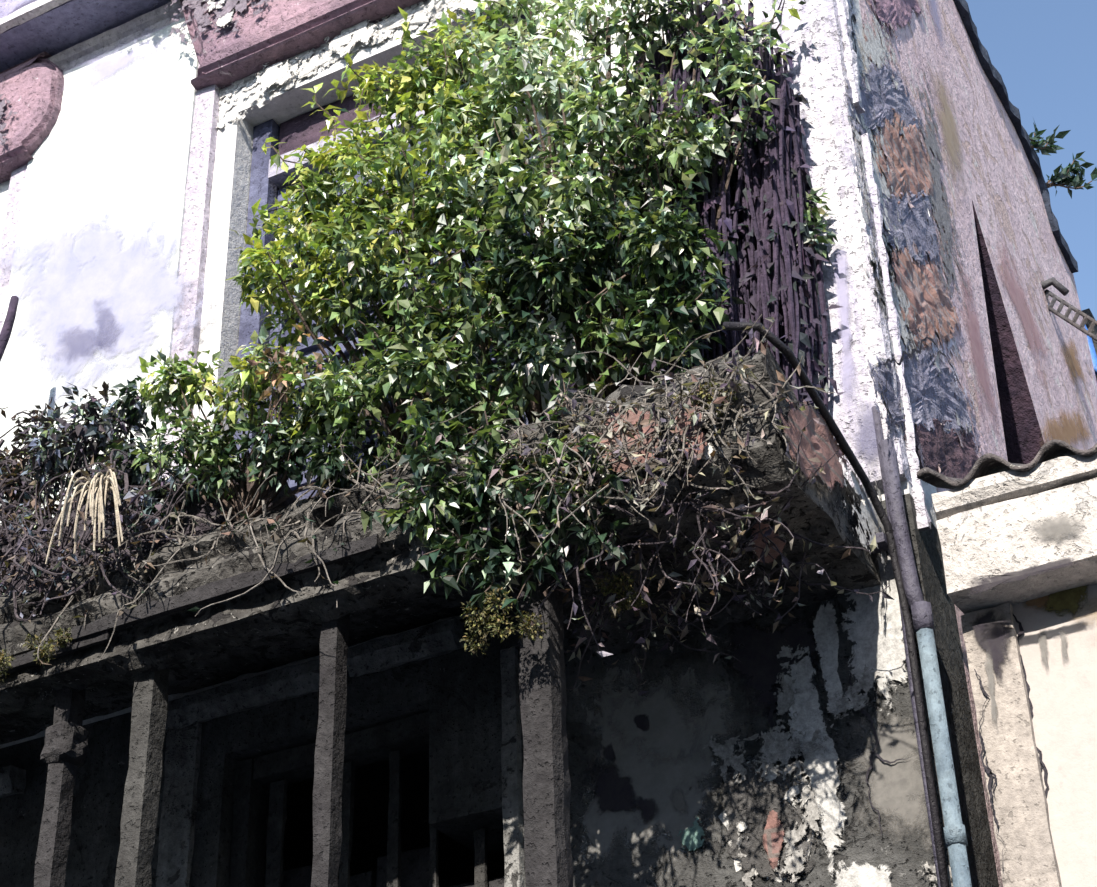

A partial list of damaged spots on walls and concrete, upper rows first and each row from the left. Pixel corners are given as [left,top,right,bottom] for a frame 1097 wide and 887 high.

peeling [0,81,17,146]
peeling [156,0,273,45]
spalling [215,0,499,130]
flaking render [831,0,984,479]
damp [0,213,202,404]
damp [1032,516,1078,538]
spalling [703,397,909,887]
damp [973,611,1010,720]
crack [1013,614,1033,718]
damp [1039,632,1048,664]
crack [1036,747,1049,796]
peeling [916,861,953,887]